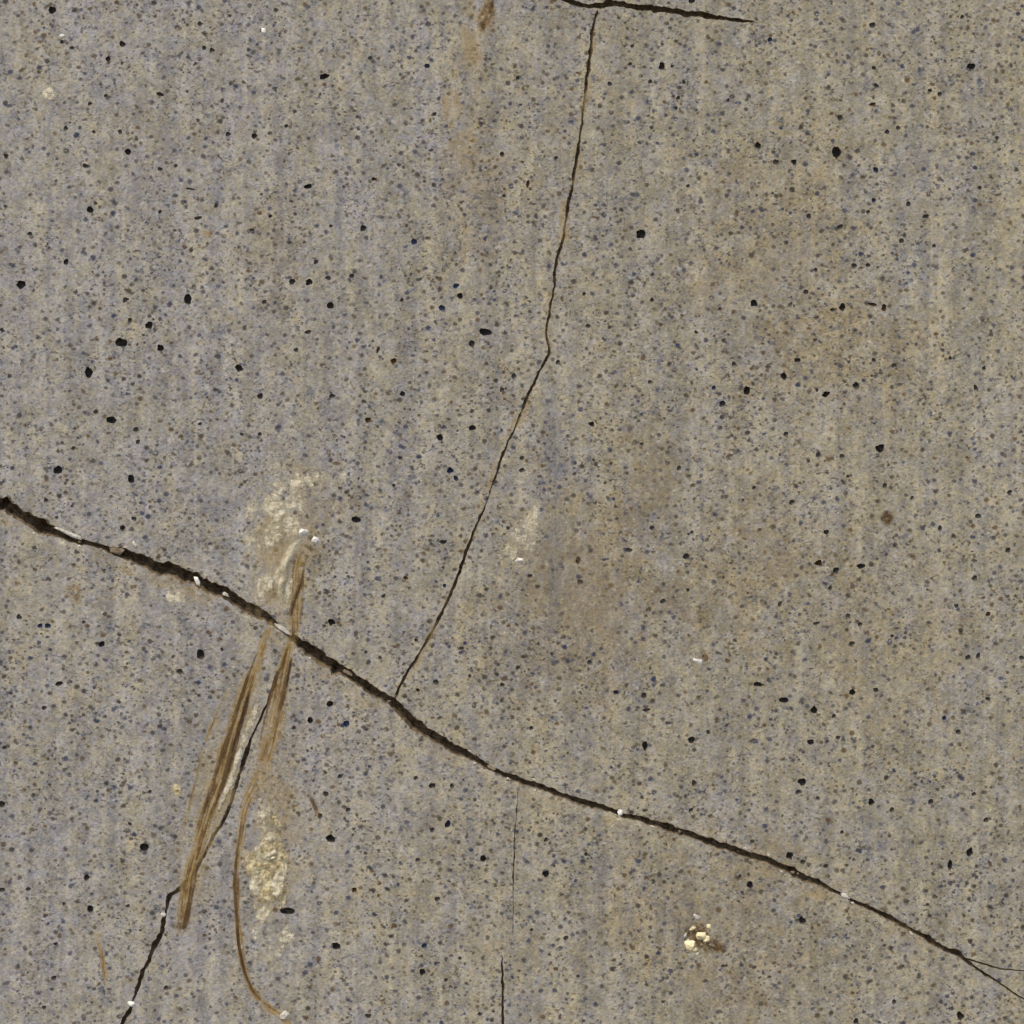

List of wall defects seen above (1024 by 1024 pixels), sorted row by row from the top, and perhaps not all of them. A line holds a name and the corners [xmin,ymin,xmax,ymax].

crack [394,0,754,700]
corrosion [176,514,307,1024]
crack [0,496,1024,1024]